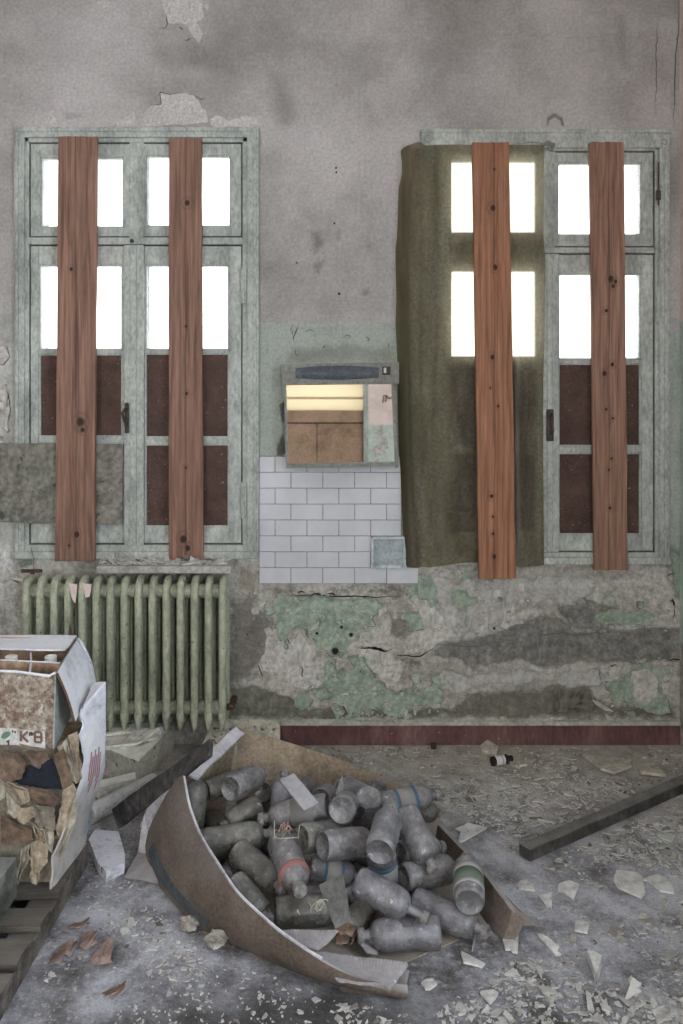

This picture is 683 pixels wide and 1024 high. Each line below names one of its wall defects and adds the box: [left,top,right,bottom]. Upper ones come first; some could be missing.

crack [654,11,679,119]
peeling [251,572,497,721]
crack [361,628,506,657]
peeling [582,657,680,720]